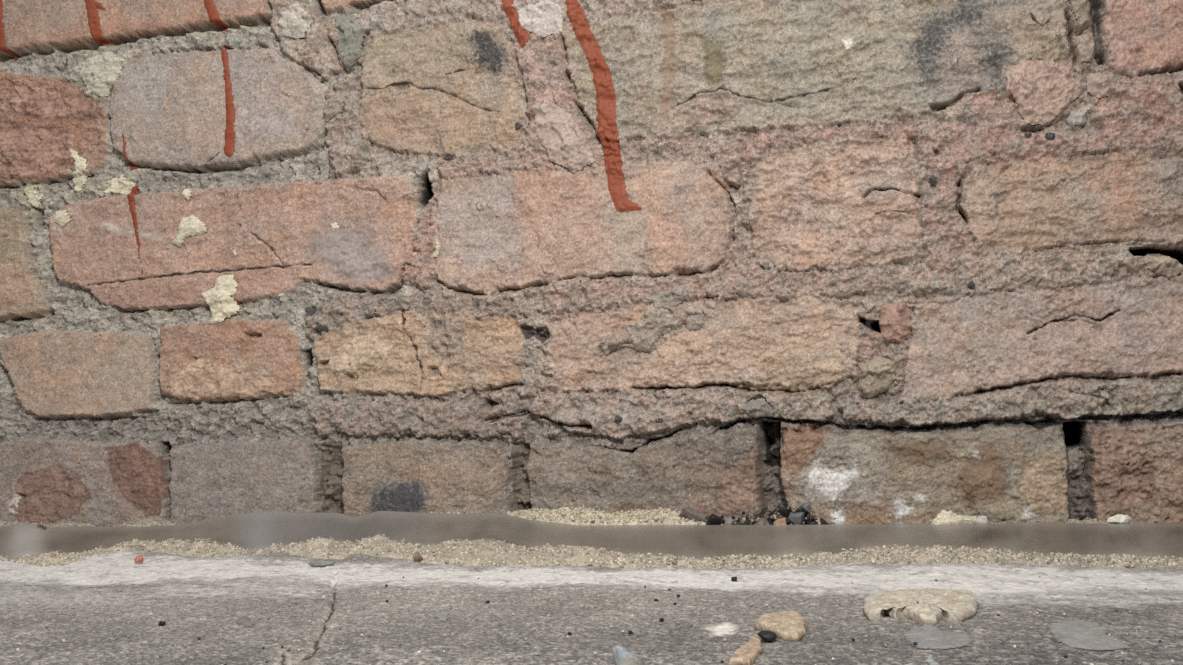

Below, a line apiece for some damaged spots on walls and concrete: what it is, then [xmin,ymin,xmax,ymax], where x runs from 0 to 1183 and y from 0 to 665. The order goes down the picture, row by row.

crack [864,188,920,214]
crack [1027,309,1121,334]
crack [637,383,745,391]
crack [282,587,337,665]